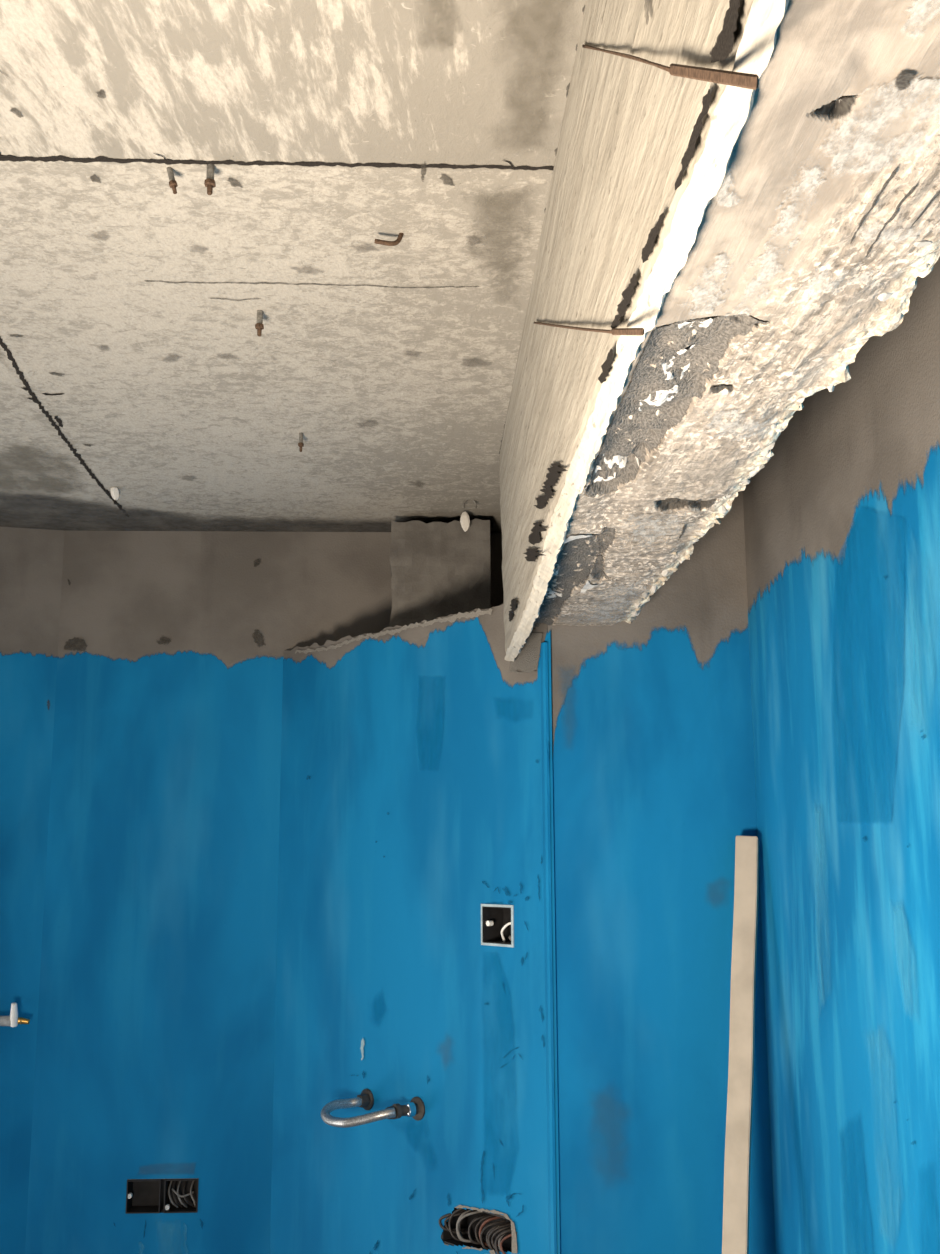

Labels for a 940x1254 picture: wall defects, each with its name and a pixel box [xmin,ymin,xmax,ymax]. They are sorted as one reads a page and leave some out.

spalling [813,95,856,119]
spalling [895,73,915,91]
spalling [586,314,769,498]
spalling [657,397,805,524]
spalling [509,527,615,673]
spalling [625,525,705,617]